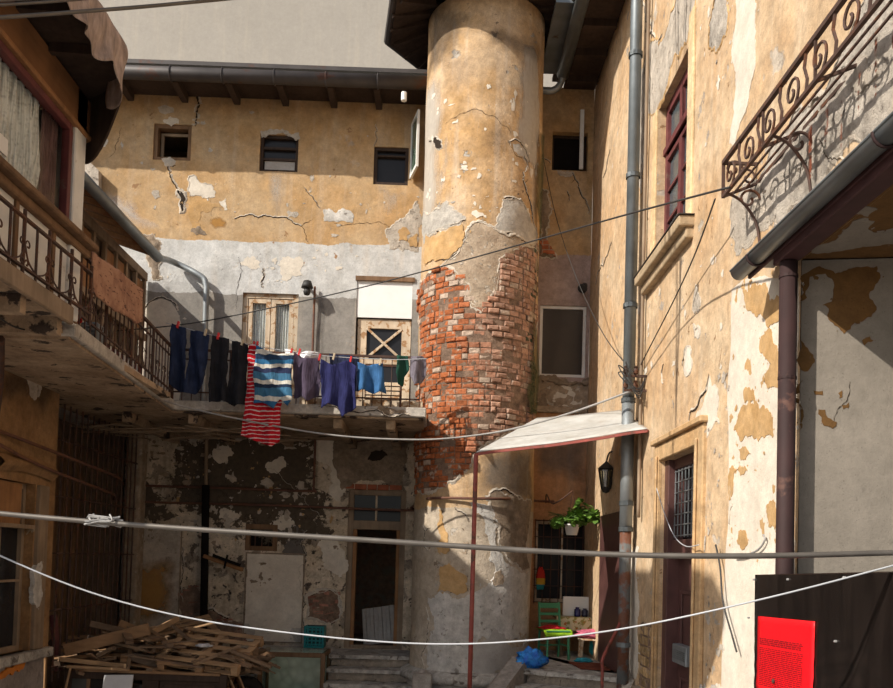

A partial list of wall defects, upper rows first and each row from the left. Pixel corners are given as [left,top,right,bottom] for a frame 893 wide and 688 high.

flaking render [639,0,696,207]
peeling [700,0,759,145]
crack [167,165,181,193]
crack [234,187,320,242]
crack [430,109,551,261]
flaking render [381,176,589,495]
peeling [796,282,804,430]
peeling [144,438,349,577]
flaking render [462,487,532,573]
peeling [695,275,779,688]
flaking render [178,585,269,644]
flaking render [282,586,343,644]